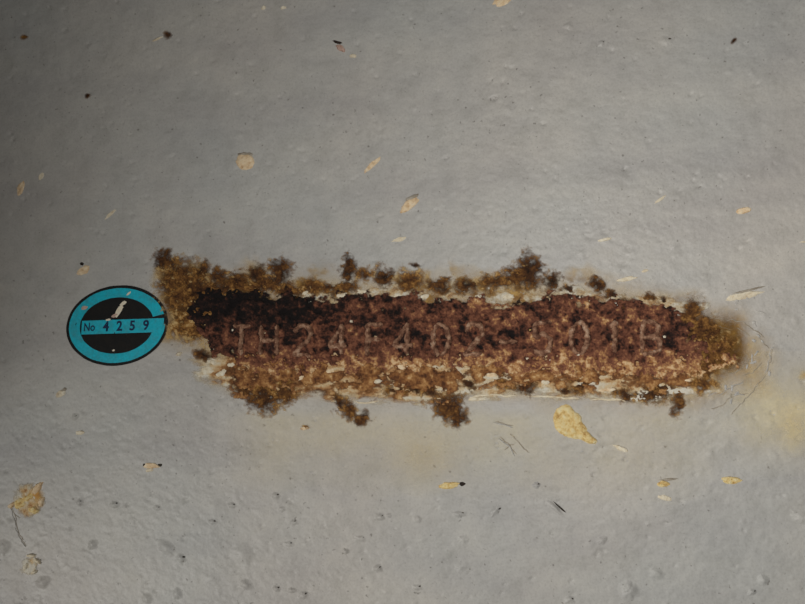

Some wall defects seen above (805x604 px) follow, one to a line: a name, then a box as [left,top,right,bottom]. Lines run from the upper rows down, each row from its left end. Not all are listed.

rust [152,248,774,427]